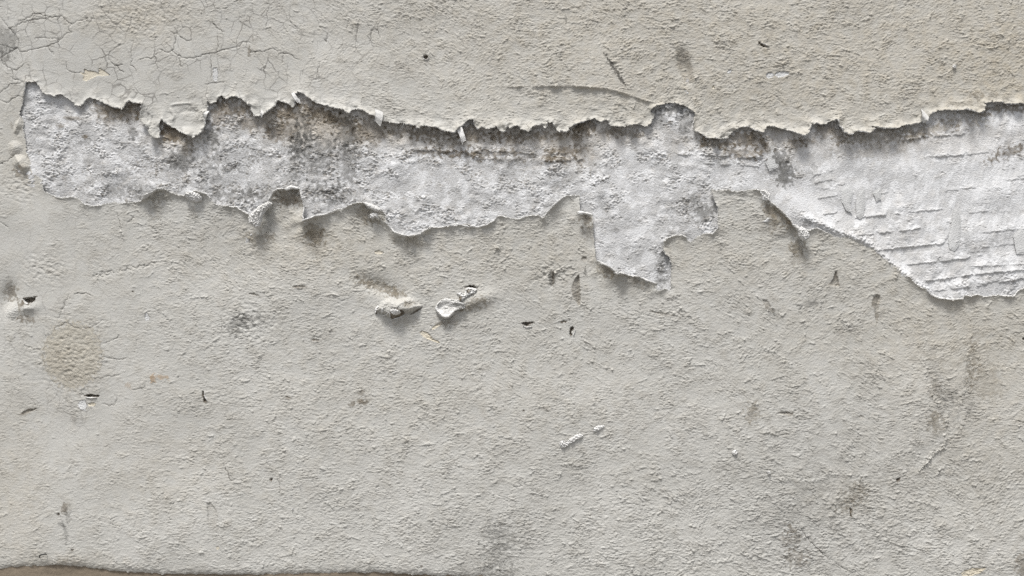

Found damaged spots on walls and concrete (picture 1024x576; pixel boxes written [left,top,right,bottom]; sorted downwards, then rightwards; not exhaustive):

crack [2,13,87,103]
peeling [17,78,1024,301]
water stain [775,160,796,186]